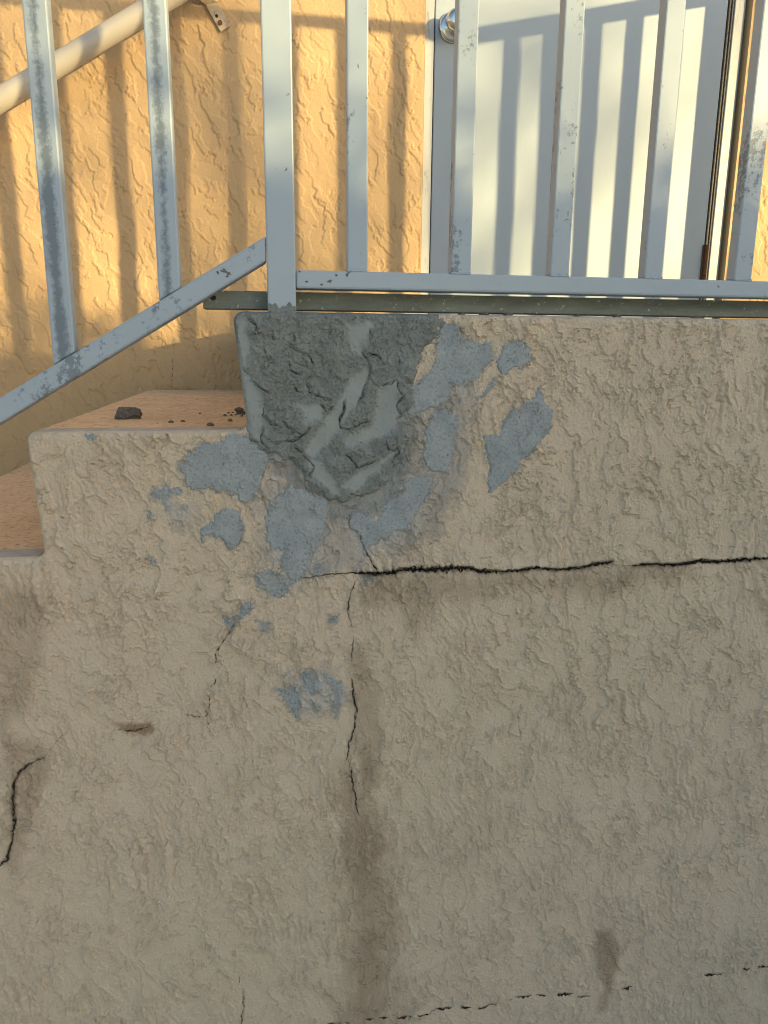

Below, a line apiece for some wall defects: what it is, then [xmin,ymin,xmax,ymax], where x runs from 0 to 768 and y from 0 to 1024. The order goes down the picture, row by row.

peeling [146,486,187,523]
crack [304,526,768,812]
crack [0,735,63,866]